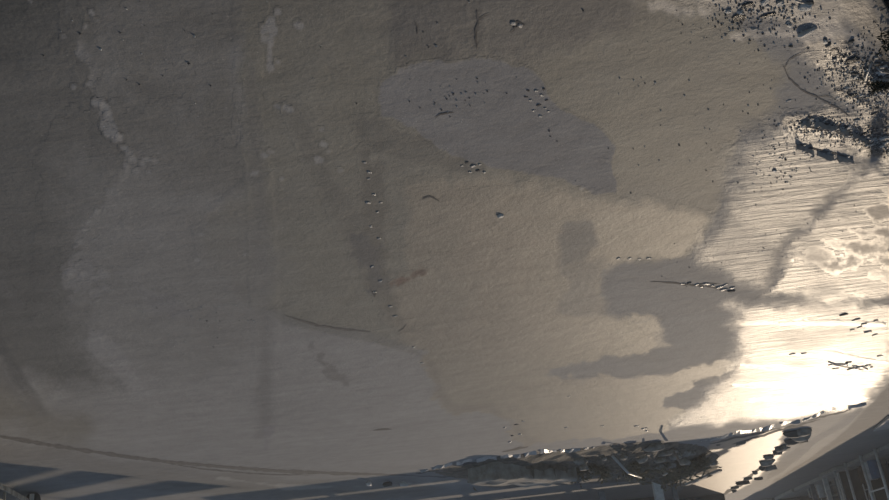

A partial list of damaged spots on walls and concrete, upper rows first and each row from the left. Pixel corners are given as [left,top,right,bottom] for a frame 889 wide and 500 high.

spalling [796,118,876,146]
spalling [796,142,854,164]
leakage [0,0,677,451]
leakage [376,0,889,447]
spalling [699,403,867,444]
leakage [0,438,470,497]
spalling [420,447,595,473]